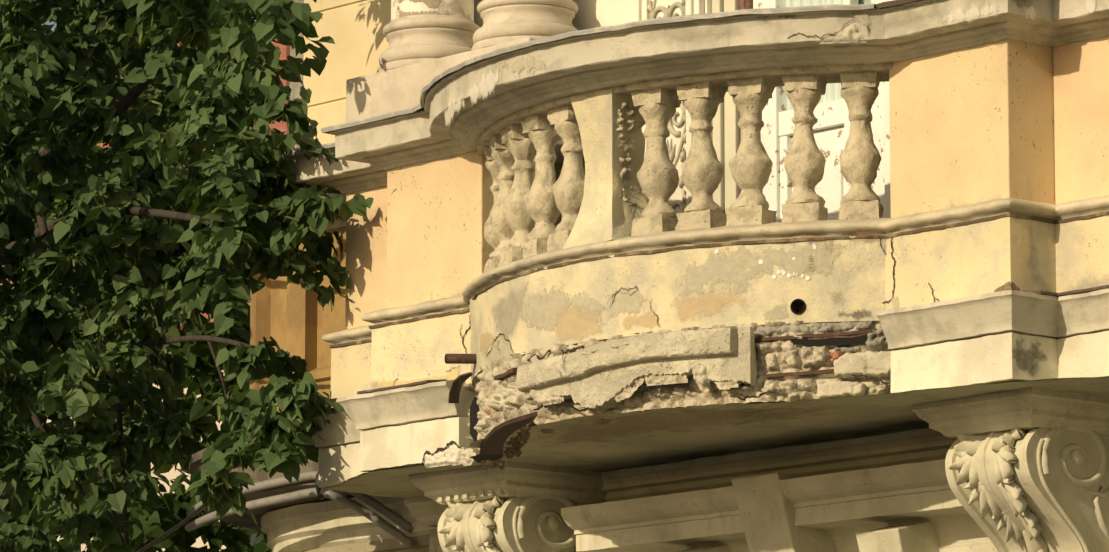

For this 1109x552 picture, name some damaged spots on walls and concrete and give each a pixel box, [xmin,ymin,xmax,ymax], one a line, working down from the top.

peeling [397,0,451,18]
crack [787,19,869,39]
peeling [675,241,840,319]
crack [879,237,896,303]
spalling [424,287,657,471]
spalling [614,305,891,404]
water stain [1013,340,1047,375]